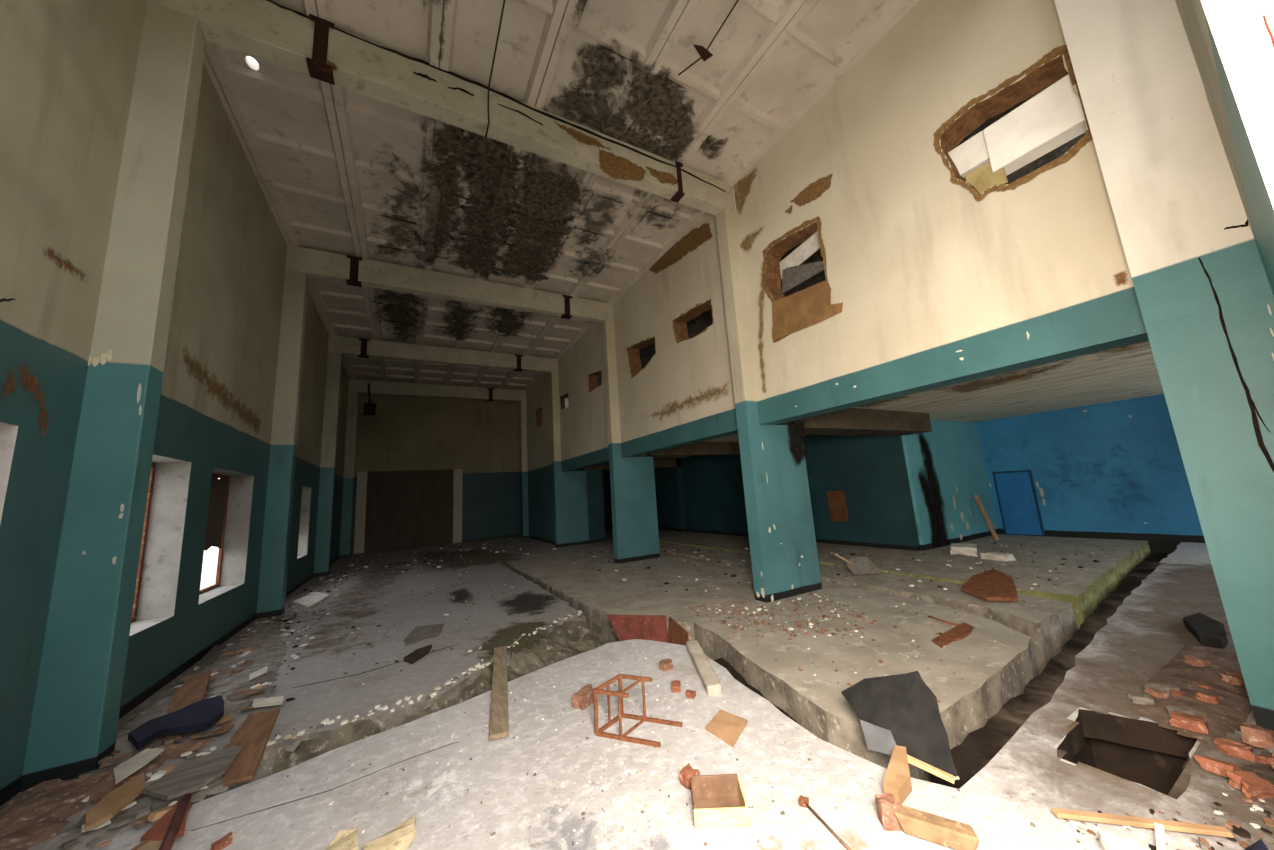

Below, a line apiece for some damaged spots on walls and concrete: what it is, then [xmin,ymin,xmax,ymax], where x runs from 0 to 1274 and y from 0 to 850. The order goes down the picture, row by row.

spalling [554,121,678,185]
leakage [544,40,727,161]
spalling [933,45,1093,201]
corrosion [48,250,79,273]
leakage [371,118,620,284]
leakage [629,190,680,229]
peeling [650,223,712,273]
peeling [762,174,833,305]
crack [1224,219,1249,230]
leakage [373,290,532,340]
crack [1198,257,1274,472]
corrosion [5,365,48,431]